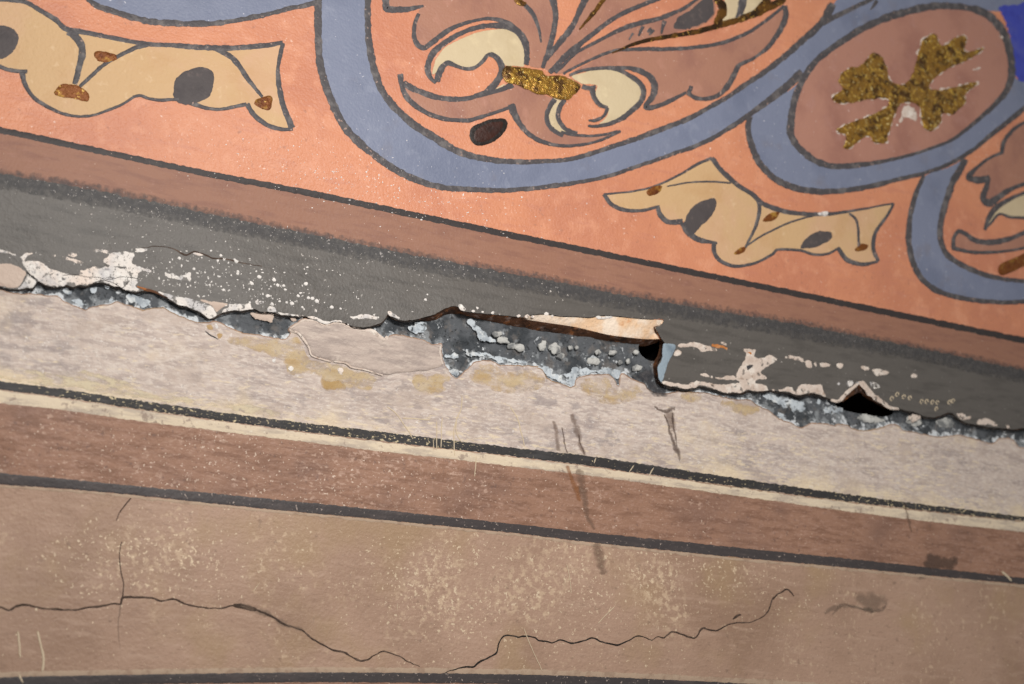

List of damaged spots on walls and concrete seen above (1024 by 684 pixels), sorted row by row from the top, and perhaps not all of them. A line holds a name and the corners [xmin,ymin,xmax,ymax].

peeling [275,141,487,225]
flaking render [0,180,1024,447]
water stain [656,407,679,455]
crack [0,498,420,667]
crack [445,589,794,673]